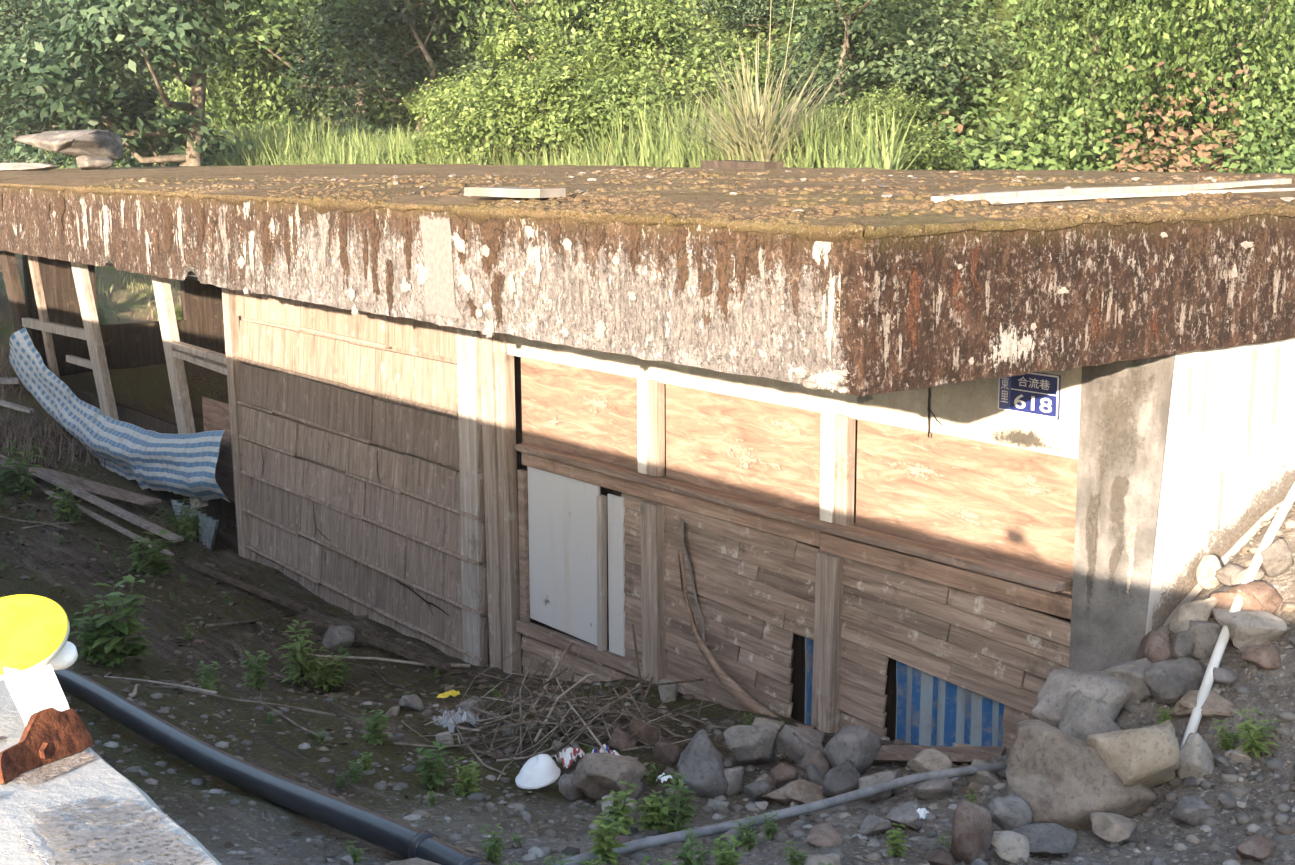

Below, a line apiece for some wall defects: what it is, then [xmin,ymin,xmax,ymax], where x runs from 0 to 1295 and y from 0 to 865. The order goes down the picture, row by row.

rust [907,267,922,358]
damp [993,430,1057,449]
damp [1086,371,1154,610]